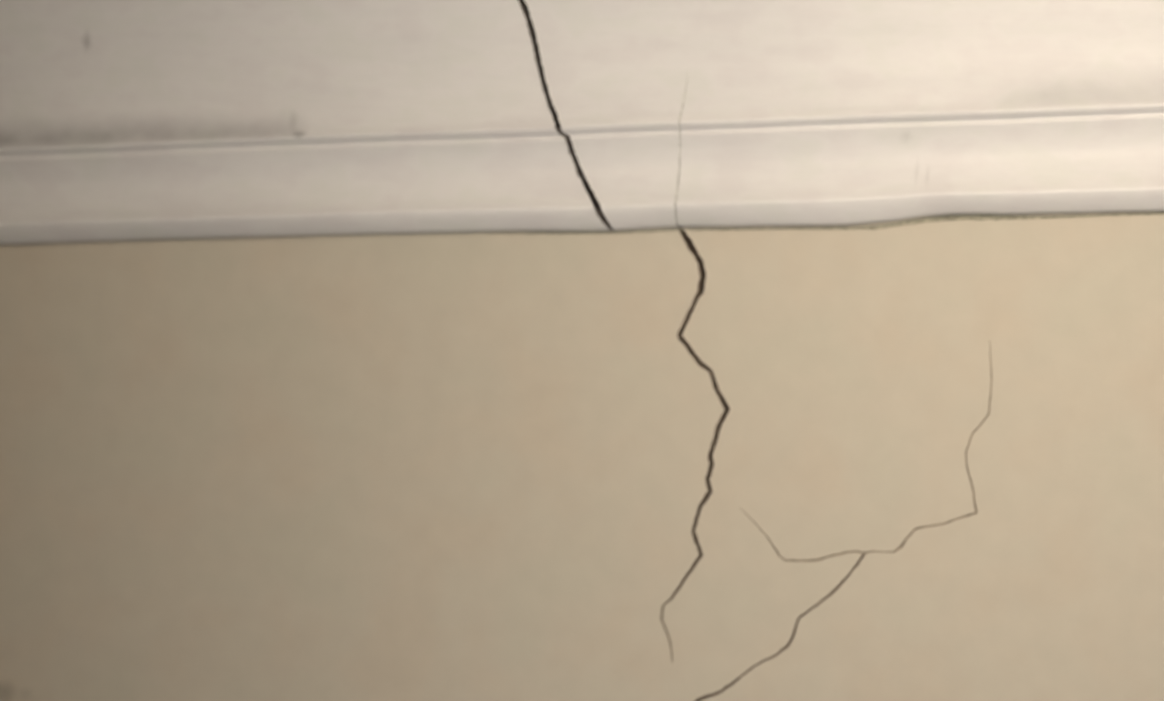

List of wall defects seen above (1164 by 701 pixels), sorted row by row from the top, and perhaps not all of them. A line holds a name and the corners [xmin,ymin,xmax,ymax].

crack [517,0,617,231]
crack [660,72,733,662]
crack [694,341,992,701]